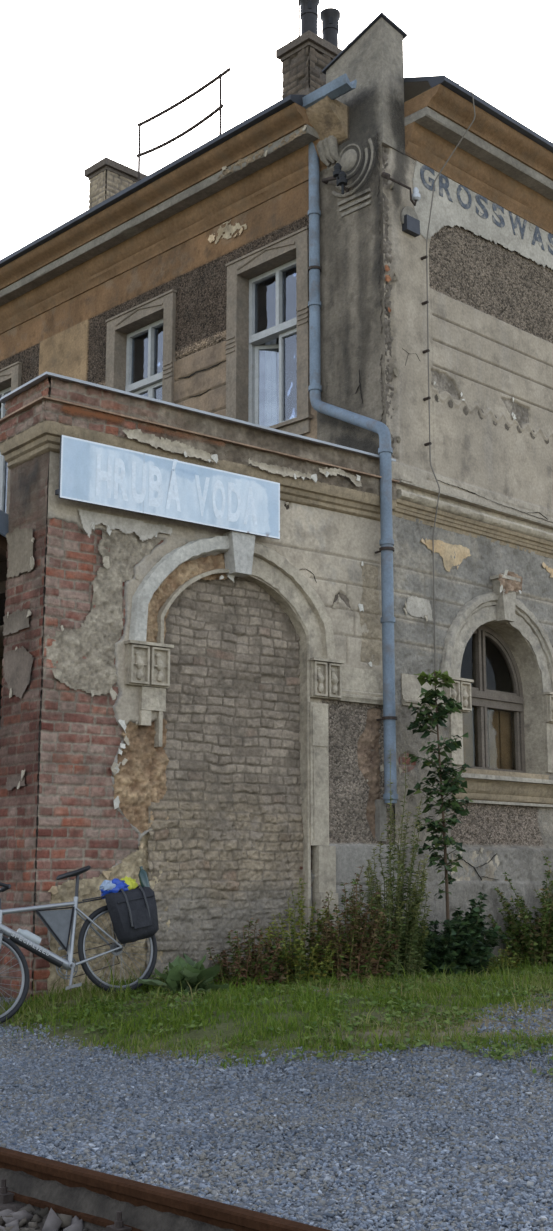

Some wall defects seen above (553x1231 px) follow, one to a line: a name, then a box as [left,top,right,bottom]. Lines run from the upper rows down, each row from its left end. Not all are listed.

spalling [146,553,235,643]
peeling [420,538,471,572]
spalling [3,509,172,1001]